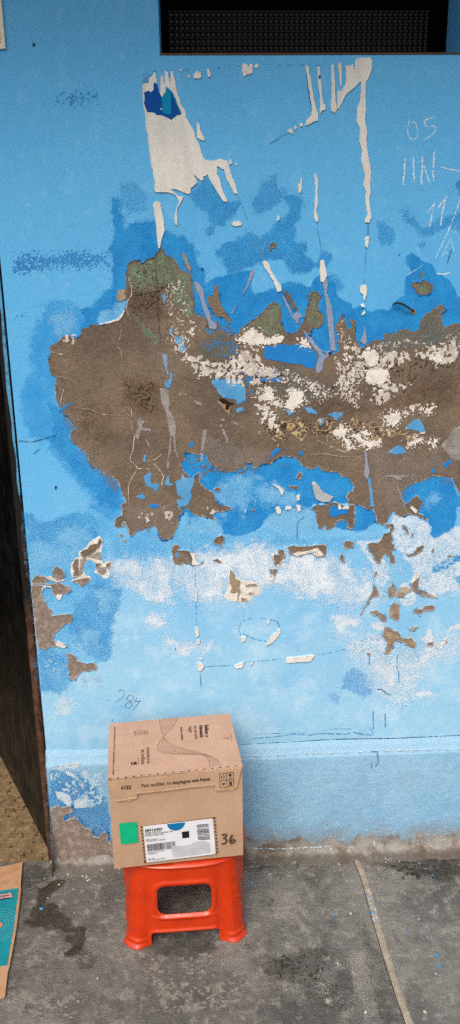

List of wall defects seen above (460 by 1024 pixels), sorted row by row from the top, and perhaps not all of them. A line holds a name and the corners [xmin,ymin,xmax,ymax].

flaking render [18,194,460,696]
flaking render [46,761,113,863]